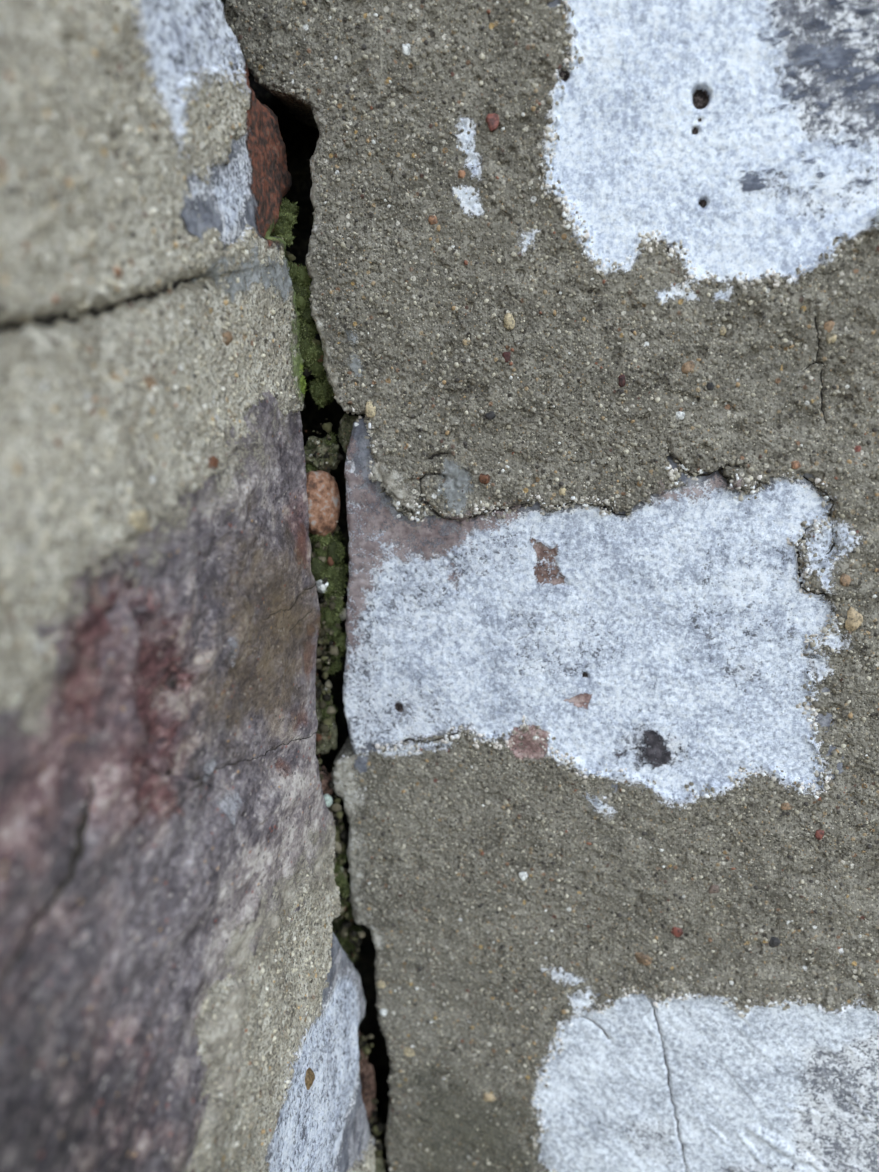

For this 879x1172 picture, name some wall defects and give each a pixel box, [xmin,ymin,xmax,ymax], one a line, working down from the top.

peeling [452,113,499,218]
peeling [542,0,879,305]
peeling [520,228,540,253]
crack [0,277,198,332]
crack [143,71,365,830]
crack [378,452,628,521]
peeling [342,454,863,810]
crack [386,732,459,748]
peeling [583,793,616,818]
crack [345,863,391,1172]
peeling [531,967,879,1172]